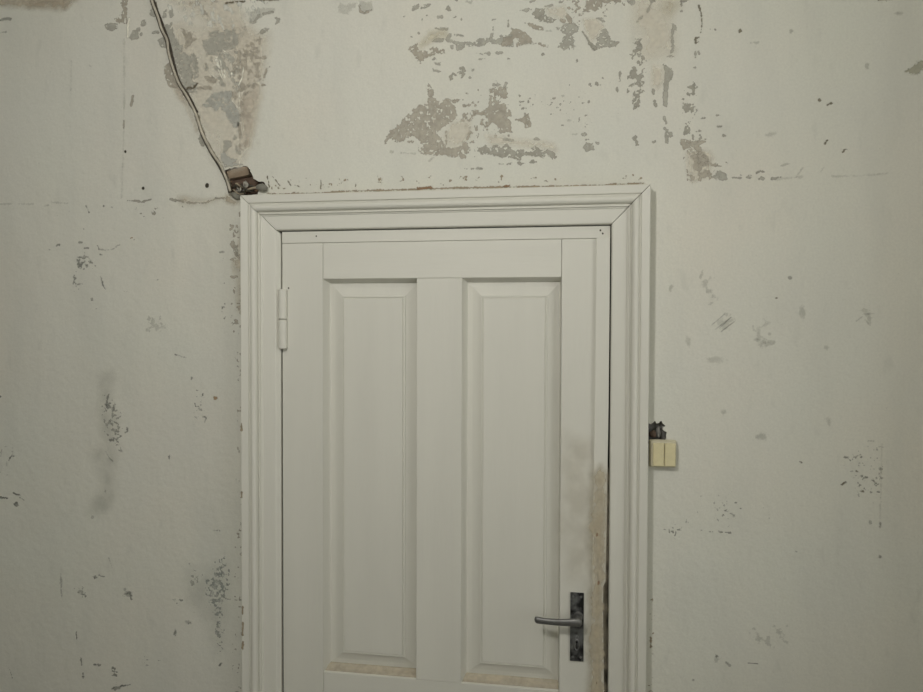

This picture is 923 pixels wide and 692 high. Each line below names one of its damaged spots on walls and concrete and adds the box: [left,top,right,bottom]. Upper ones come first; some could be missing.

peeling [105,0,267,195]
peeling [384,82,557,166]
peeling [403,0,635,80]
peeling [616,24,779,181]